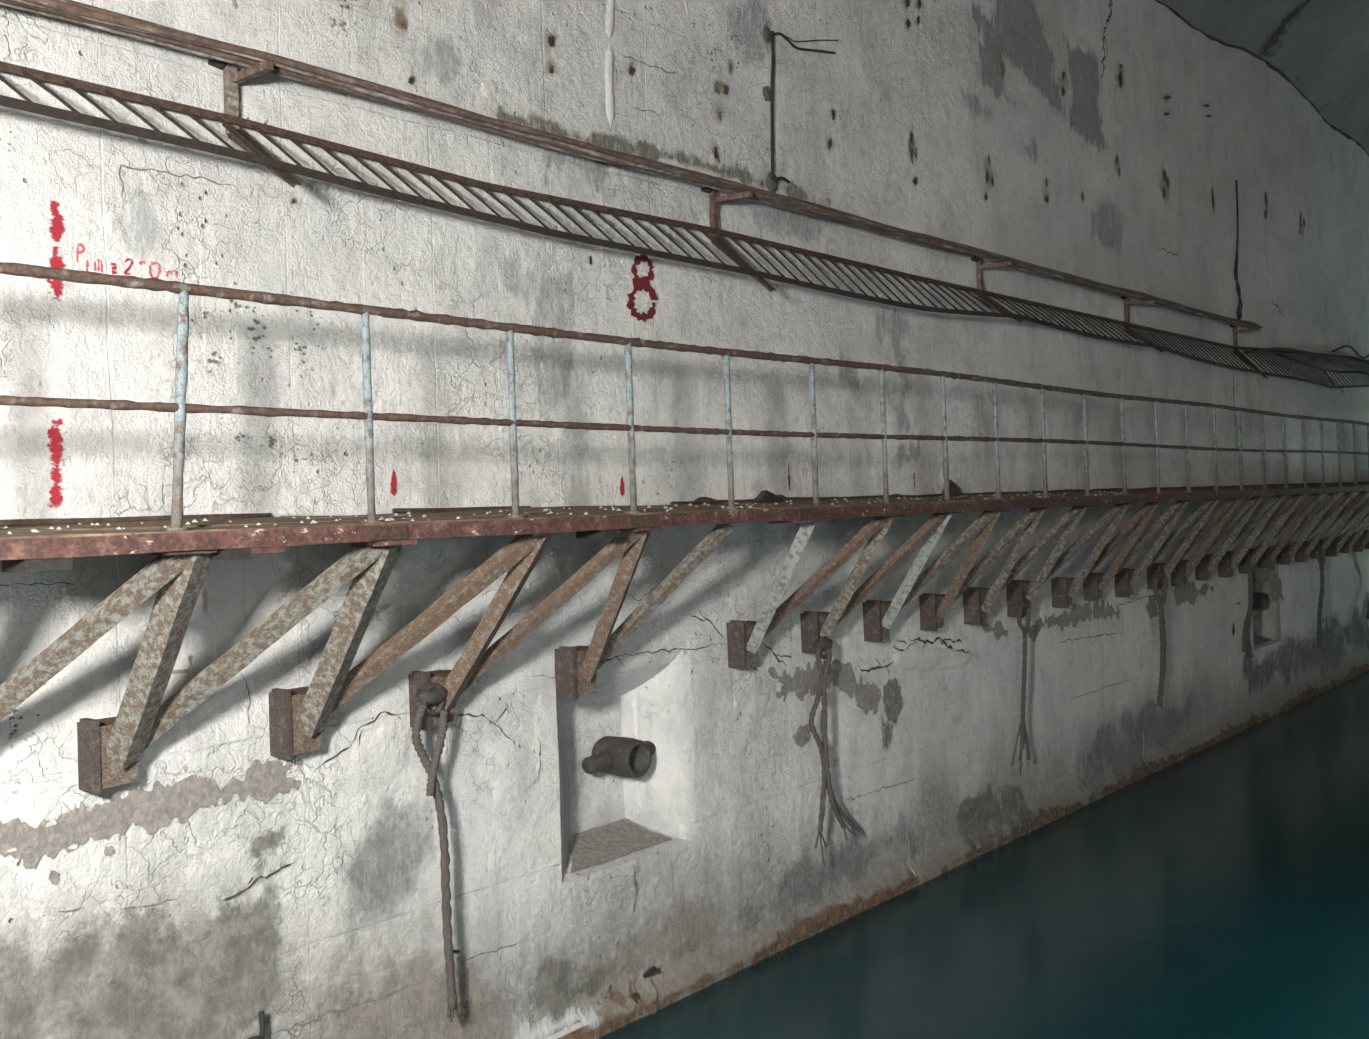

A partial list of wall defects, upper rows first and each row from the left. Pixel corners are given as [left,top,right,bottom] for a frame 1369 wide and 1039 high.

rust [714,63,732,95]
peeling [969,0,1105,151]
crack [1155,0,1369,156]
crack [313,711,402,772]
spalling [793,723,811,747]
spalling [769,659,881,715]
crack [861,637,971,673]
leakage [958,593,1369,861]
spalling [0,756,301,885]
leakage [0,886,280,1039]
crack [220,861,297,933]
leakage [335,809,918,1039]